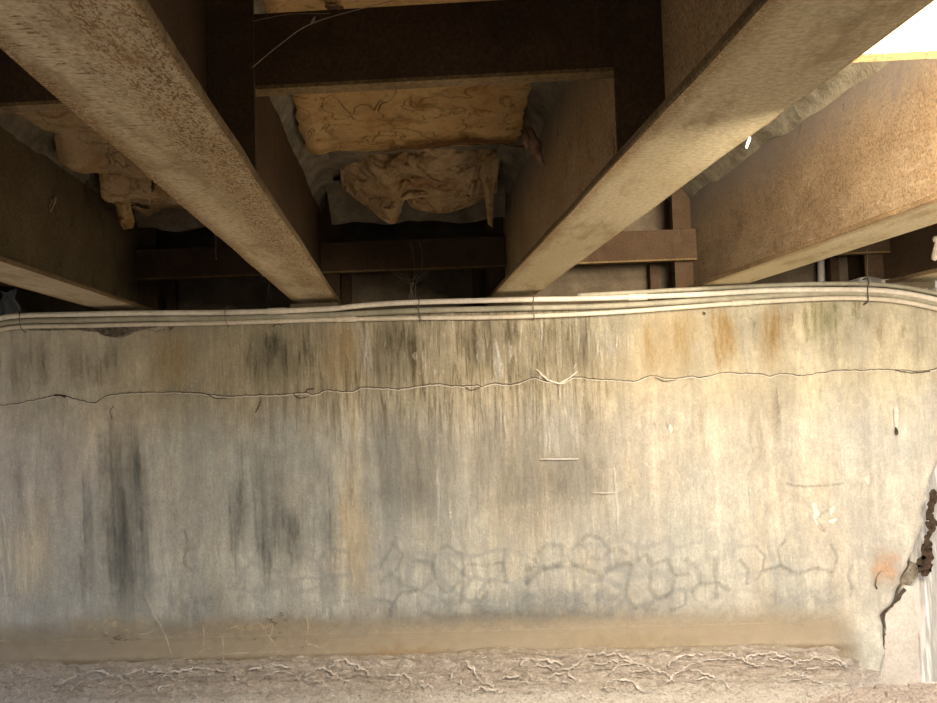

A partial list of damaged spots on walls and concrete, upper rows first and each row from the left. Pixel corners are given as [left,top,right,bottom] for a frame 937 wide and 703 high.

crack [0,368,937,420]
crack [875,489,937,649]